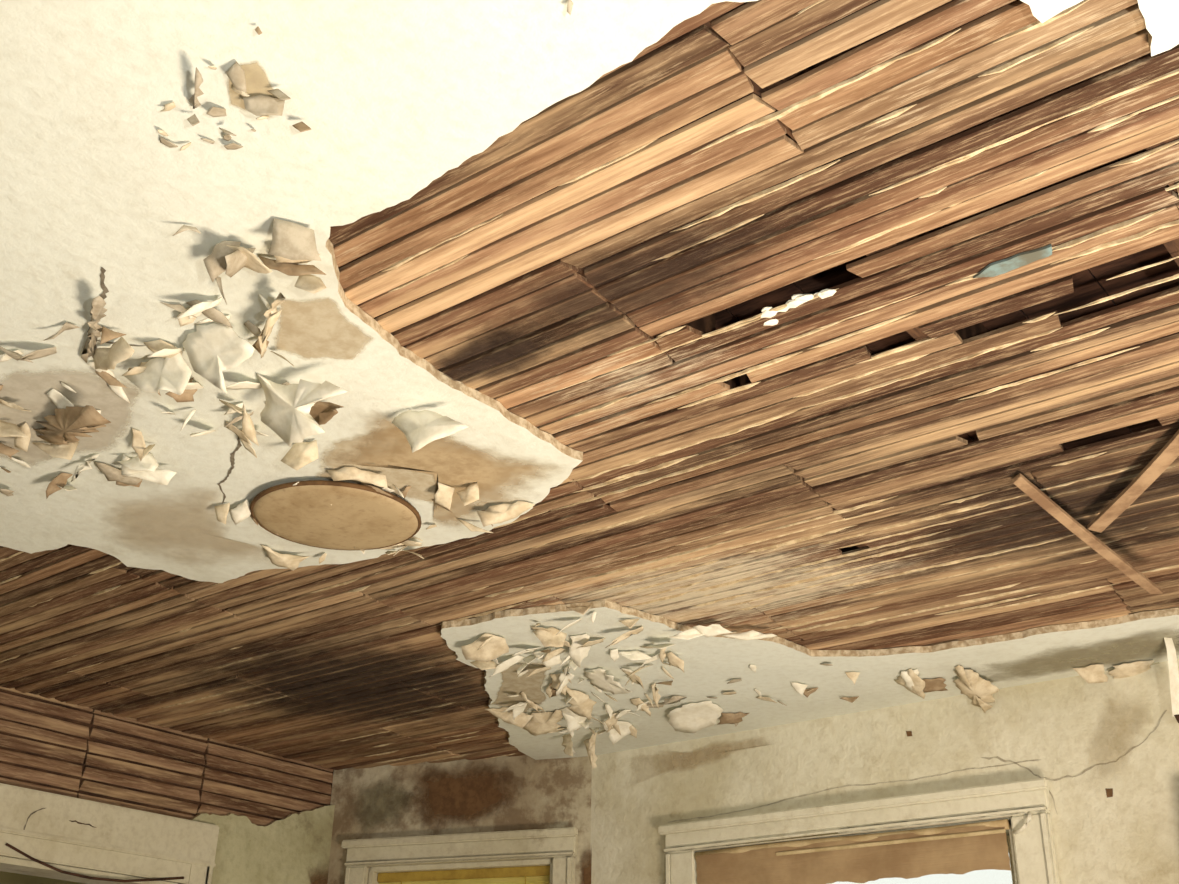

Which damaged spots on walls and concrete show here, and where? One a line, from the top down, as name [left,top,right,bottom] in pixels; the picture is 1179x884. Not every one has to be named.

peeling [158,61,291,151]
flaking render [1107,256,1179,280]
crack [87,267,138,359]
peeling [0,218,479,512]
flaking render [0,686,334,826]
spalling [419,767,512,821]
peeling [461,618,644,769]
peeling [667,697,749,733]
peeling [669,624,777,640]
peeling [894,665,999,713]
damp [1011,633,1179,675]
peeling [1073,637,1179,723]